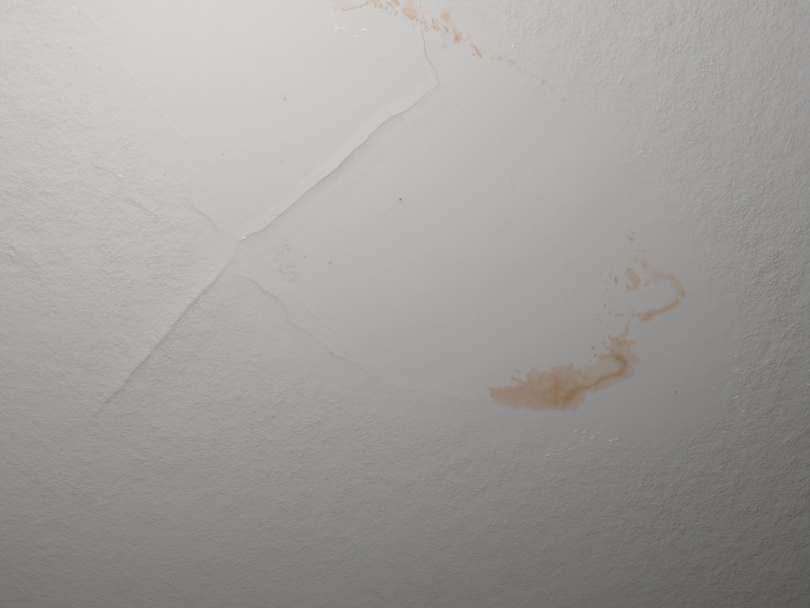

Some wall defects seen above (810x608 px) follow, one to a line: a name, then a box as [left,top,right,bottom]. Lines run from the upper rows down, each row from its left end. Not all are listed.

water stain [333,0,569,104]
water stain [486,225,688,413]